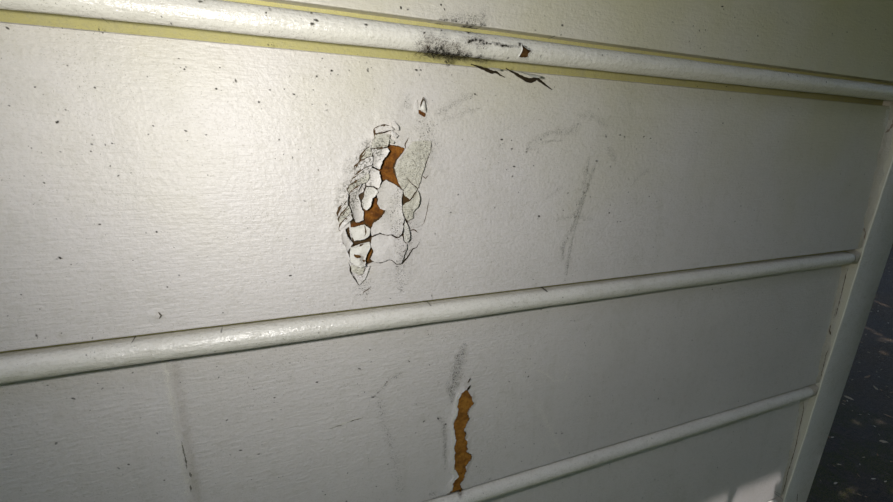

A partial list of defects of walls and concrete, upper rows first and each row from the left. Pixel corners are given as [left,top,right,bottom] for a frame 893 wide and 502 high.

crack [471,64,552,90]
peeling [310,92,451,298]
peeling [432,354,477,499]